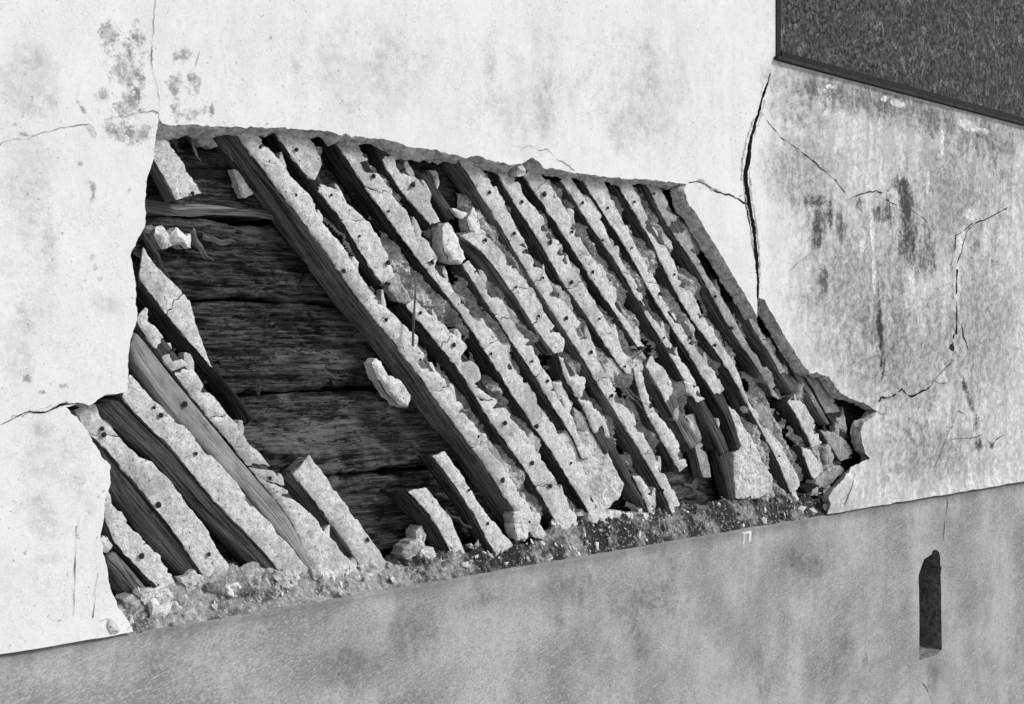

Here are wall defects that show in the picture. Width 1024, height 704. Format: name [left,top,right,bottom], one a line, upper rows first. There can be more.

crack [0,0,160,146]
water stain [100,24,147,142]
flaking render [155,116,877,513]
crack [689,73,927,297]
water stain [805,196,844,248]
water stain [856,175,936,376]
crack [879,208,1007,467]
crack [0,401,79,425]
flaking render [101,618,119,634]